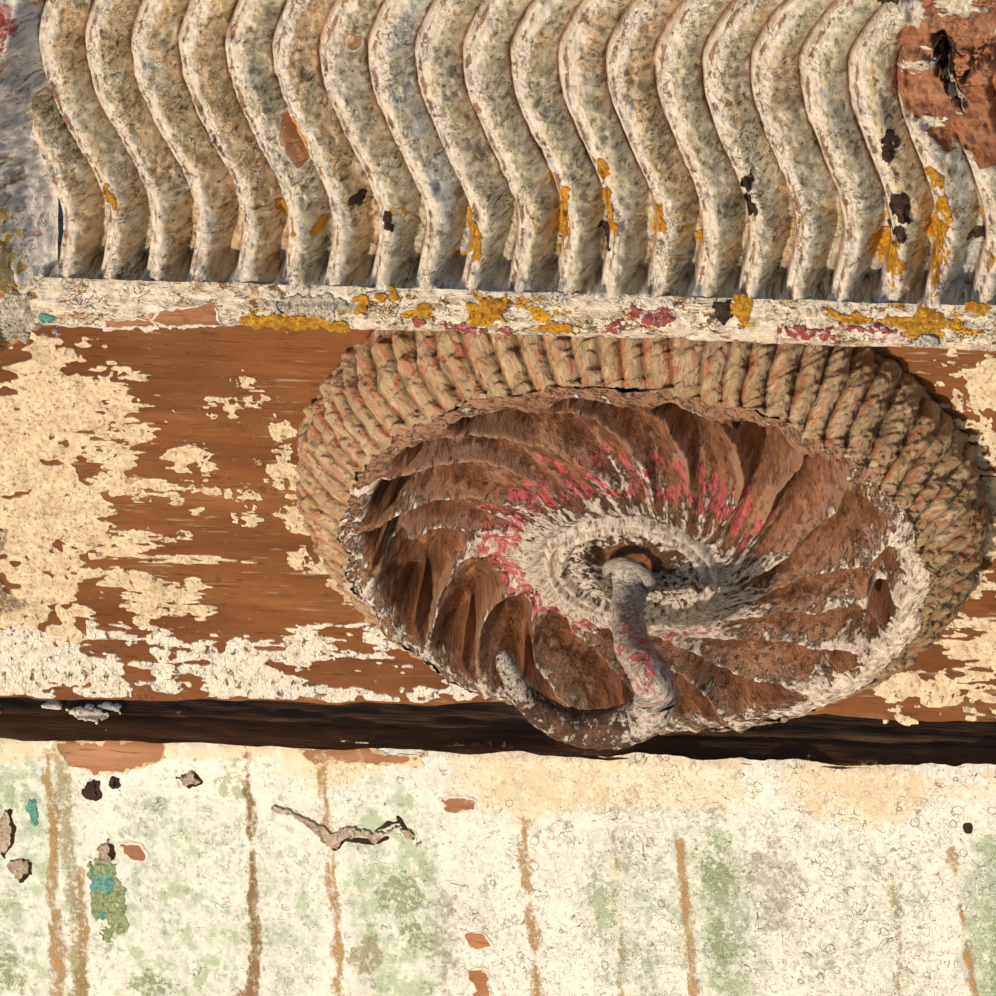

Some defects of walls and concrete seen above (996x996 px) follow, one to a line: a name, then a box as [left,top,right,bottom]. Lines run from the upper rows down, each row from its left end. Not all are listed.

peeling [0,292,478,724]
peeling [933,349,996,600]
peeling [873,612,996,726]
peeling [53,740,166,801]
peeling [298,740,428,768]
peeling [0,809,32,883]
damp [51,744,87,996]
crack [271,804,421,851]
damp [374,866,431,948]
damp [698,804,748,996]
damp [0,953,25,992]
damp [127,973,179,996]